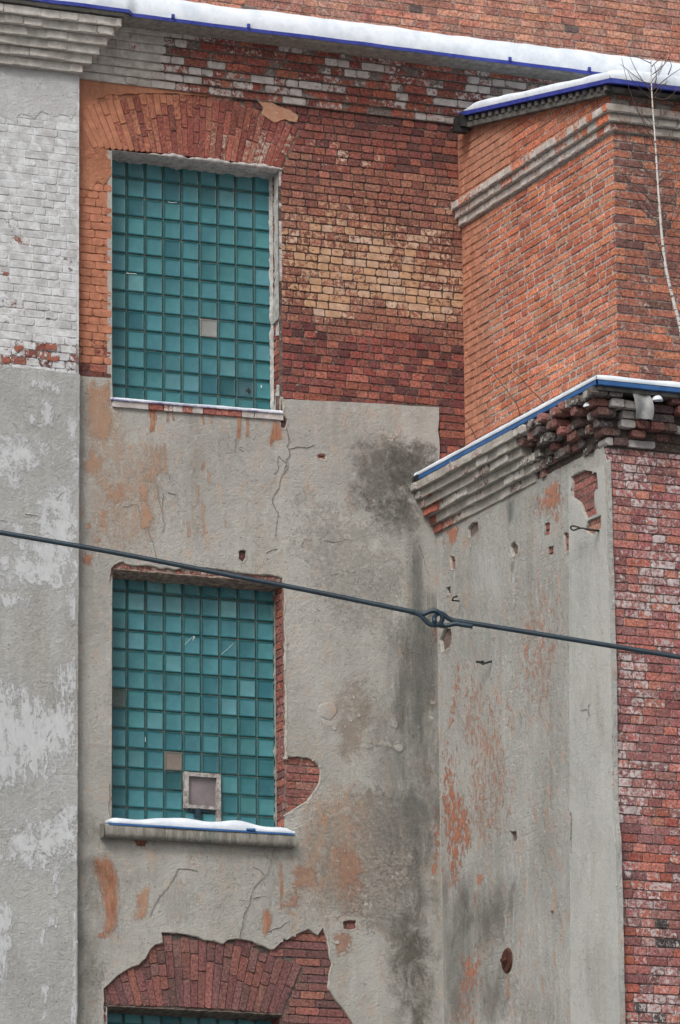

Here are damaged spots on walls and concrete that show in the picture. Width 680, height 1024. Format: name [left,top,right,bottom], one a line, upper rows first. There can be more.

peeling [0,378,124,621]
crack [266,430,312,553]
damp [356,444,433,531]
flaking render [536,468,601,556]
peeling [0,655,76,795]
flaking render [108,547,323,816]
peeling [0,804,77,898]
crack [150,868,195,915]
crack [240,847,276,935]
peeling [70,903,78,1024]
flaking render [102,912,358,1024]